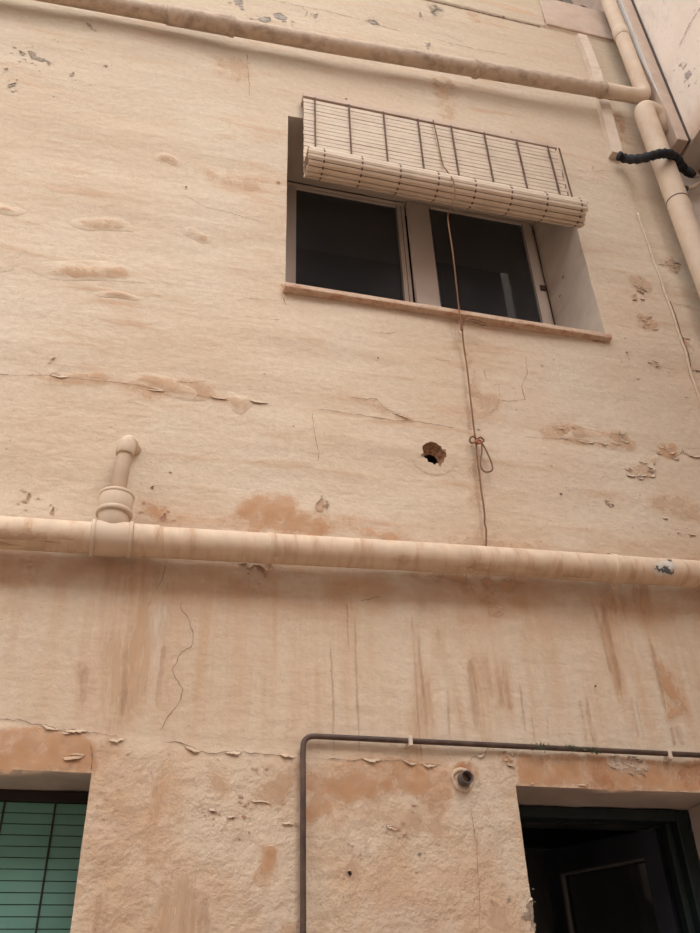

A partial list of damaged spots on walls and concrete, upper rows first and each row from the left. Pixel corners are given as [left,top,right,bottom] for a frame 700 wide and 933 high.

crack [30,373,228,407]
peeling [314,495,331,518]
crack [162,609,295,758]
crack [330,757,437,768]